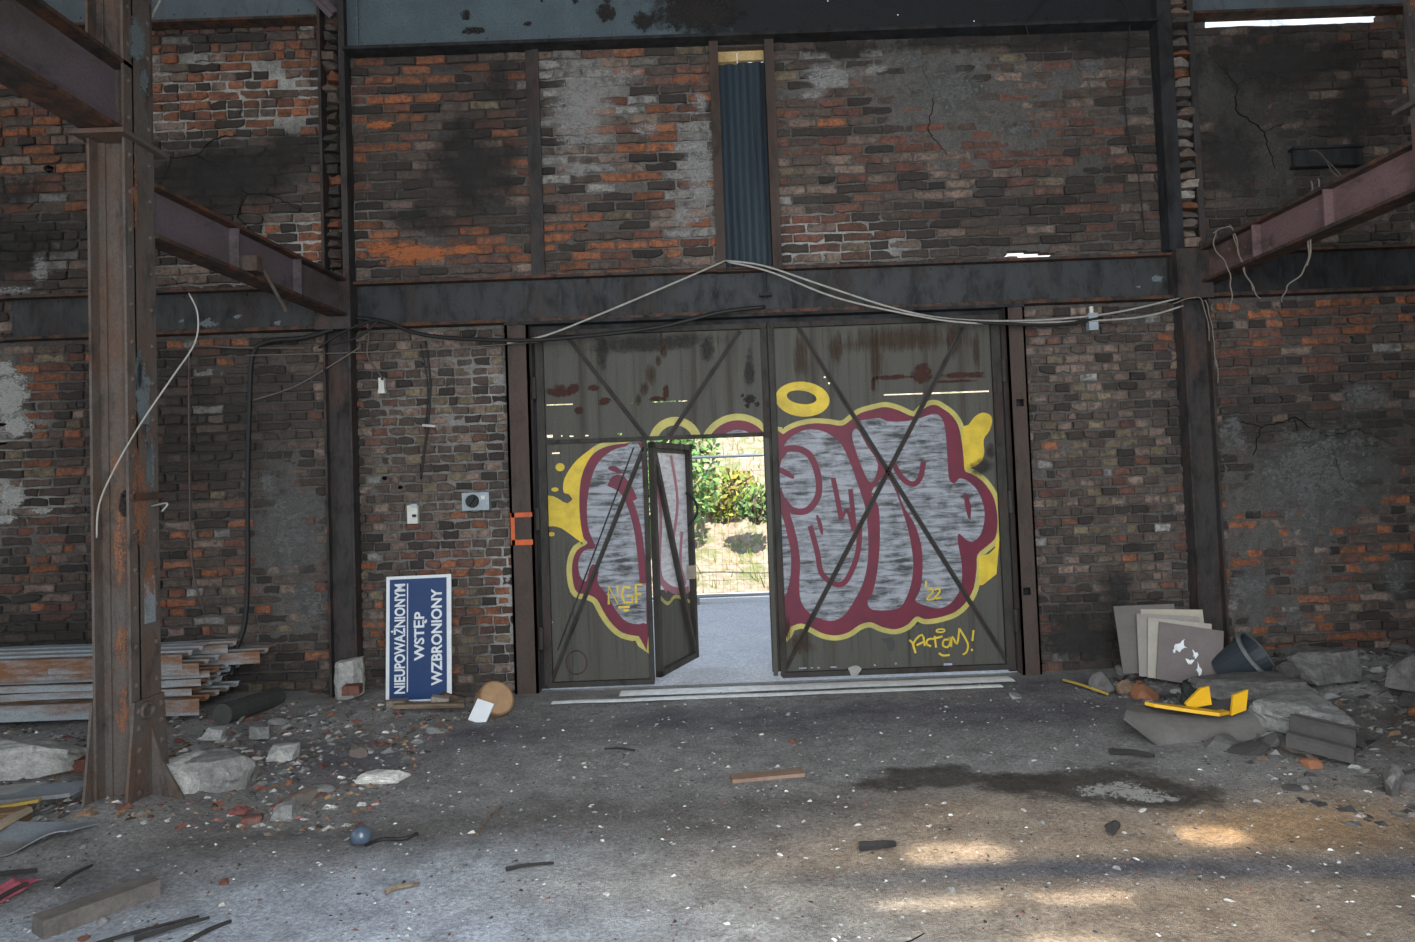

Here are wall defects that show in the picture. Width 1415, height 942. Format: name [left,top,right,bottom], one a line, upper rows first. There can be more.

crack [1215,61,1289,169]
spalling [0,360,35,445]
spalling [0,482,53,524]
corrosion [110,433,158,598]
leakage [859,763,1223,809]